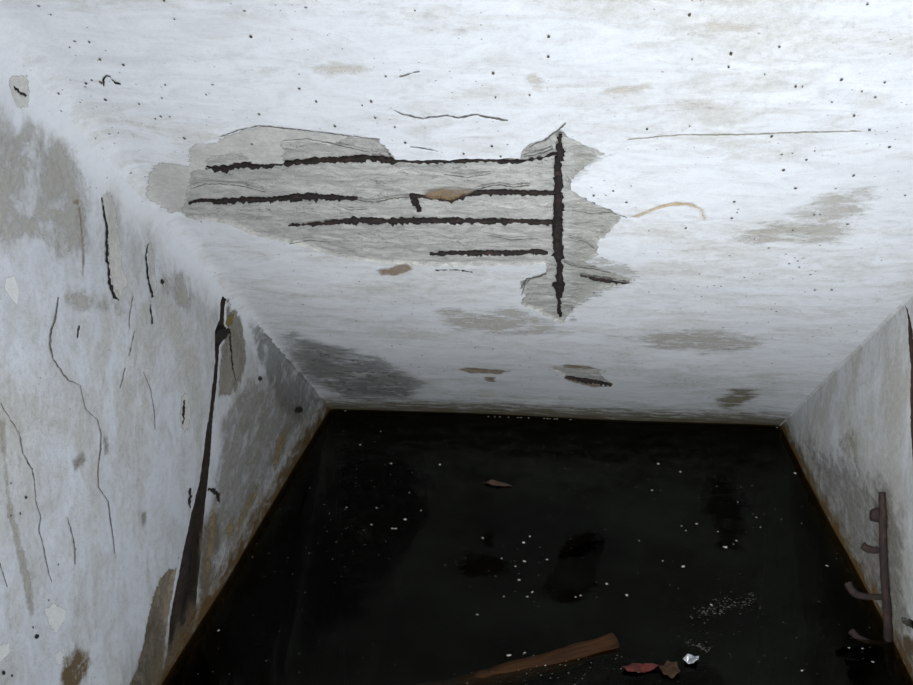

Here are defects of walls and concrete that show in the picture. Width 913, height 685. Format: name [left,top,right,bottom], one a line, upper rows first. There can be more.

rust [188,133,566,317]
spalling [146,125,635,323]
rust [580,273,627,285]
crack [1,403,52,582]
crack [49,297,115,554]
damp [139,327,913,685]
spalling [549,364,613,385]
rust [62,649,90,685]